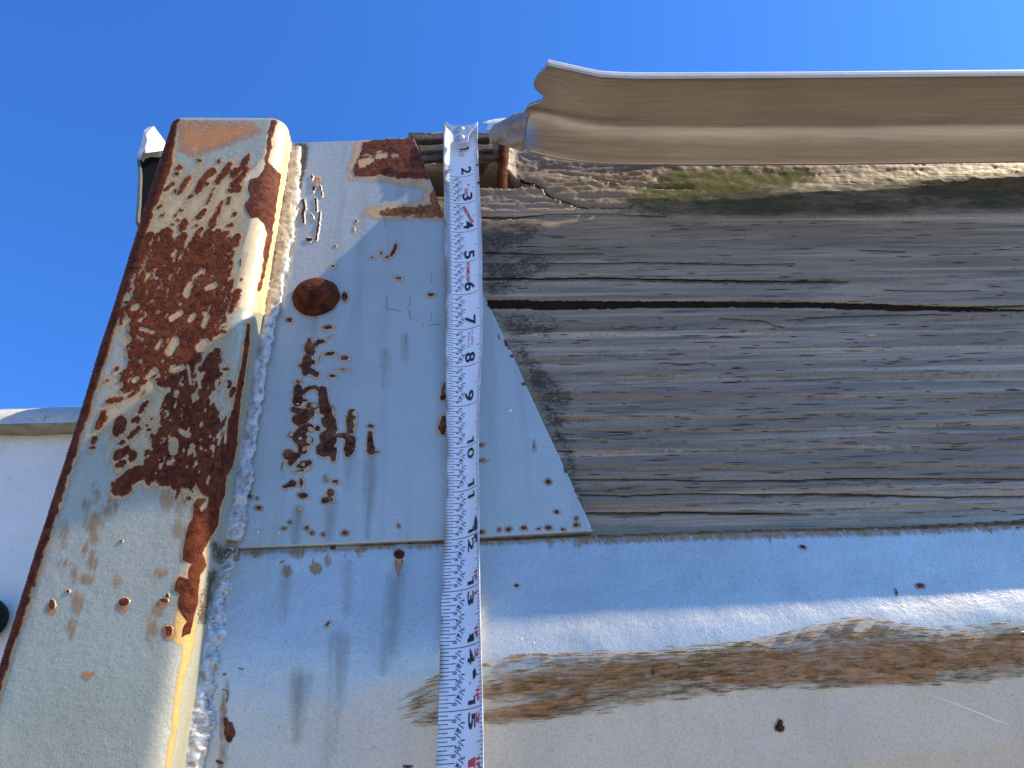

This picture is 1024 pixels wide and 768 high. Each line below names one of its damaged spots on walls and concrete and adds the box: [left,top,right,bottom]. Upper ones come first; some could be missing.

corrosion [348,138,445,233]
crack [718,315,880,328]
crack [917,290,1024,315]
corrosion [0,119,301,768]
corrosion [281,324,381,505]
corrosion [283,526,328,574]